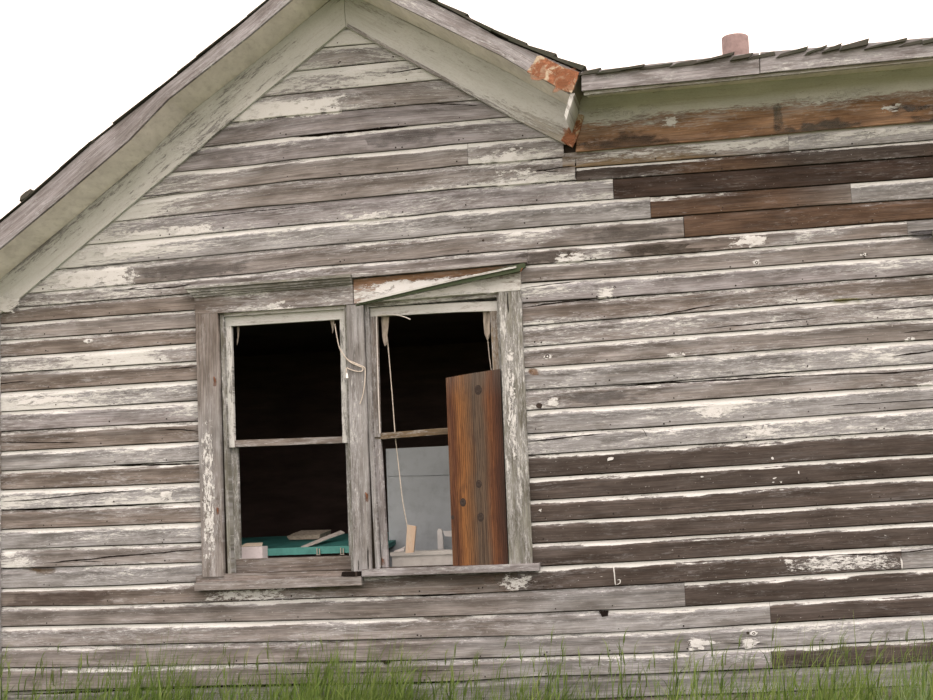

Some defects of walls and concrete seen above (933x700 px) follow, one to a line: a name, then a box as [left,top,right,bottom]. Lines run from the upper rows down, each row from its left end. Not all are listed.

peeling [360,274,495,300]
peeling [0,293,20,313]
peeling [201,422,215,567]
peeling [785,555,899,571]
peeling [494,573,536,590]
peeling [205,588,290,601]